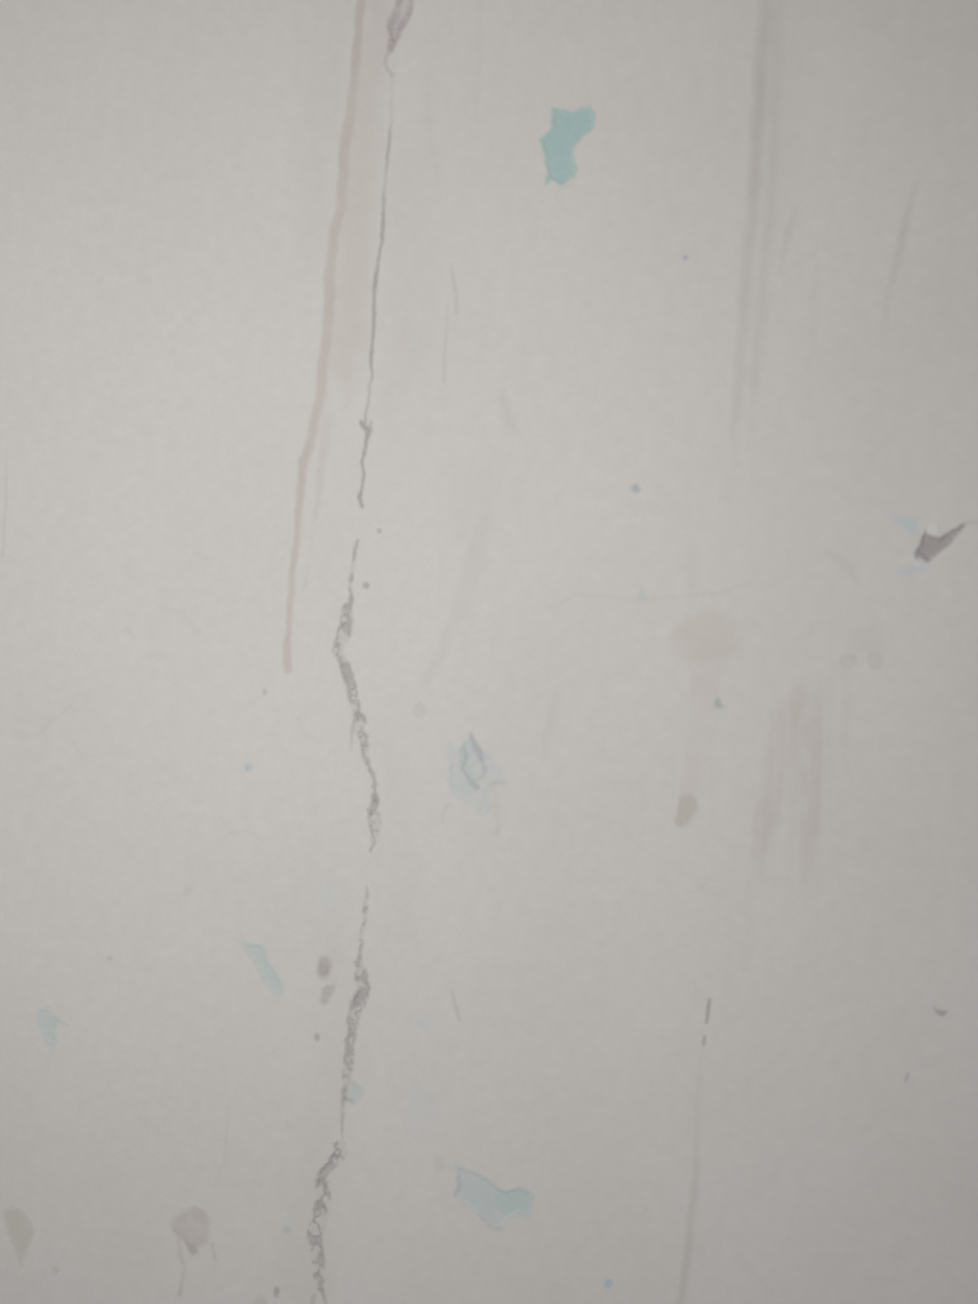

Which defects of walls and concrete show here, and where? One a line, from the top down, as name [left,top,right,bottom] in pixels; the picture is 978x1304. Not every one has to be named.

water stain [280,0,368,676]
crack [305,0,416,1304]
peeling [537,104,597,193]
flaking render [885,513,978,579]